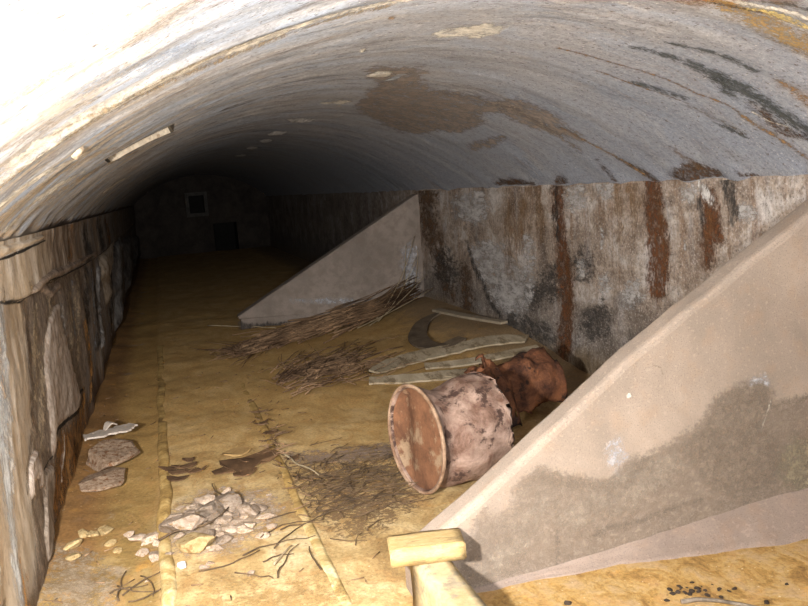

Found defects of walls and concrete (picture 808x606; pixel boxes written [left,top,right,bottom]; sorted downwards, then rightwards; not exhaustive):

water stain [0,0,410,189]
spalling [433,23,502,38]
water stain [629,42,808,140]
corrosion [676,0,808,58]
crack [0,235,46,260]
crack [0,246,110,305]
water stain [0,145,116,233]
corrosion [496,176,575,362]
corrosion [596,159,672,302]
corrosion [673,149,759,270]
water stain [0,304,34,606]
water stain [462,376,808,584]